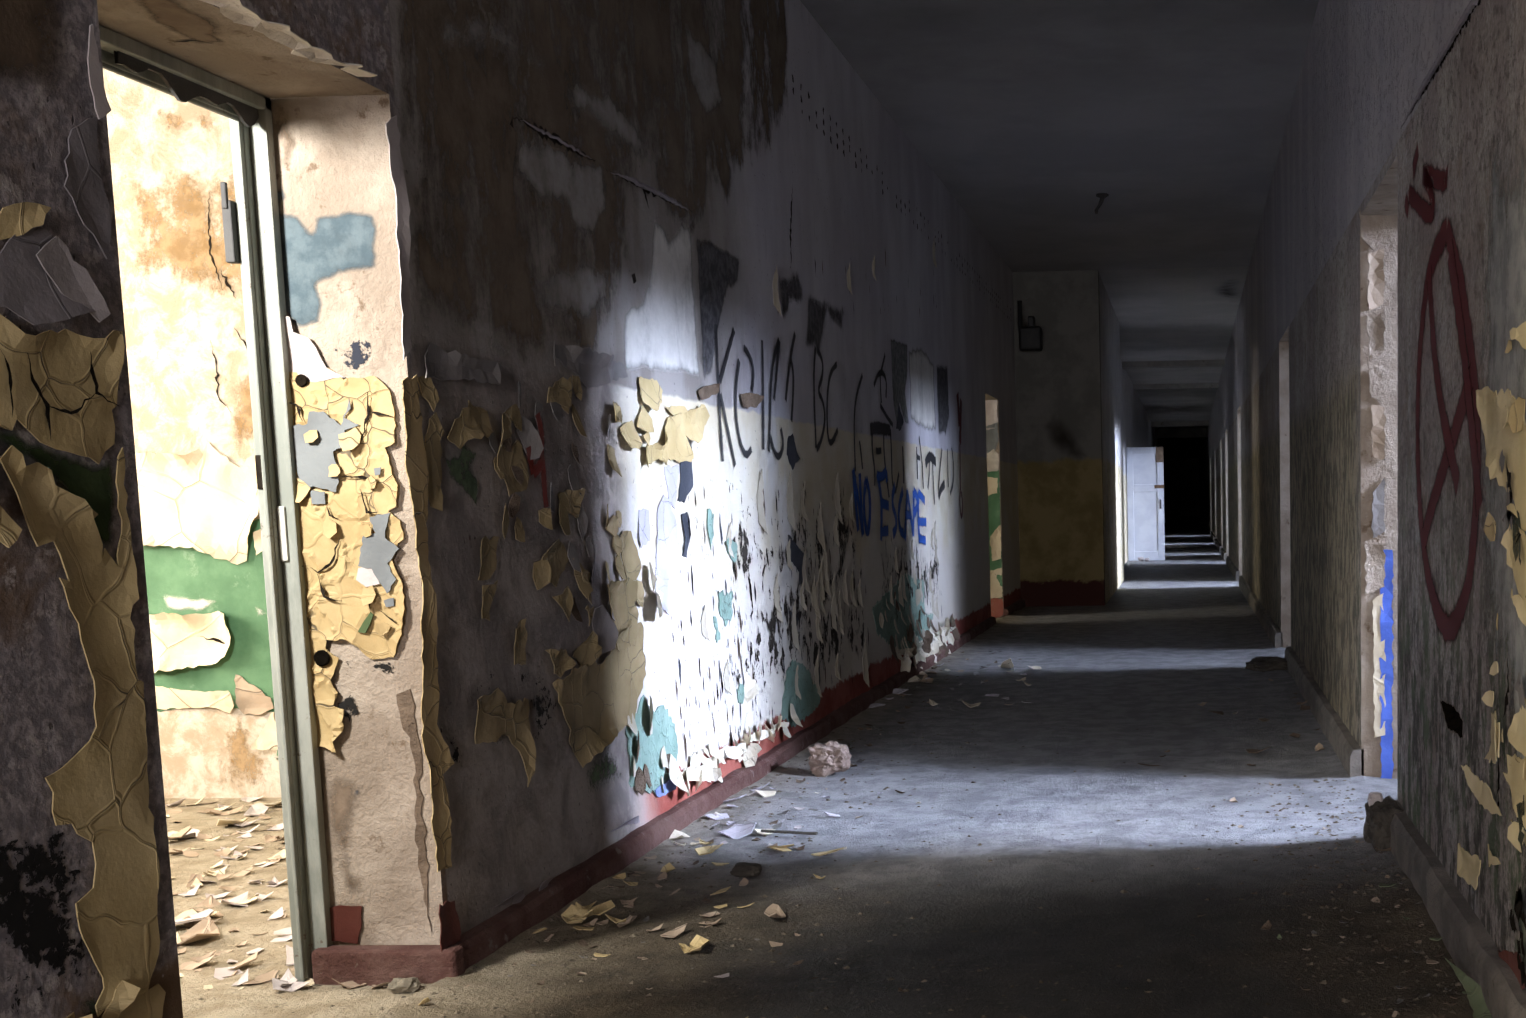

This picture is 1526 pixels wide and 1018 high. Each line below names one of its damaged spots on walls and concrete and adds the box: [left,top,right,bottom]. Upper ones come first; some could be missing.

flaking render [200,0,377,77]
peeling [64,24,111,259]
peeling [1505,321,1526,353]
peeling [0,202,278,1018]
peeling [284,116,961,952]
peeling [1359,211,1386,738]
peeling [1476,386,1526,626]
flaking render [1440,701,1463,739]
peeling [1461,658,1526,857]
damp [0,825,95,1015]
peeling [1457,843,1501,890]
peeling [1498,885,1526,990]